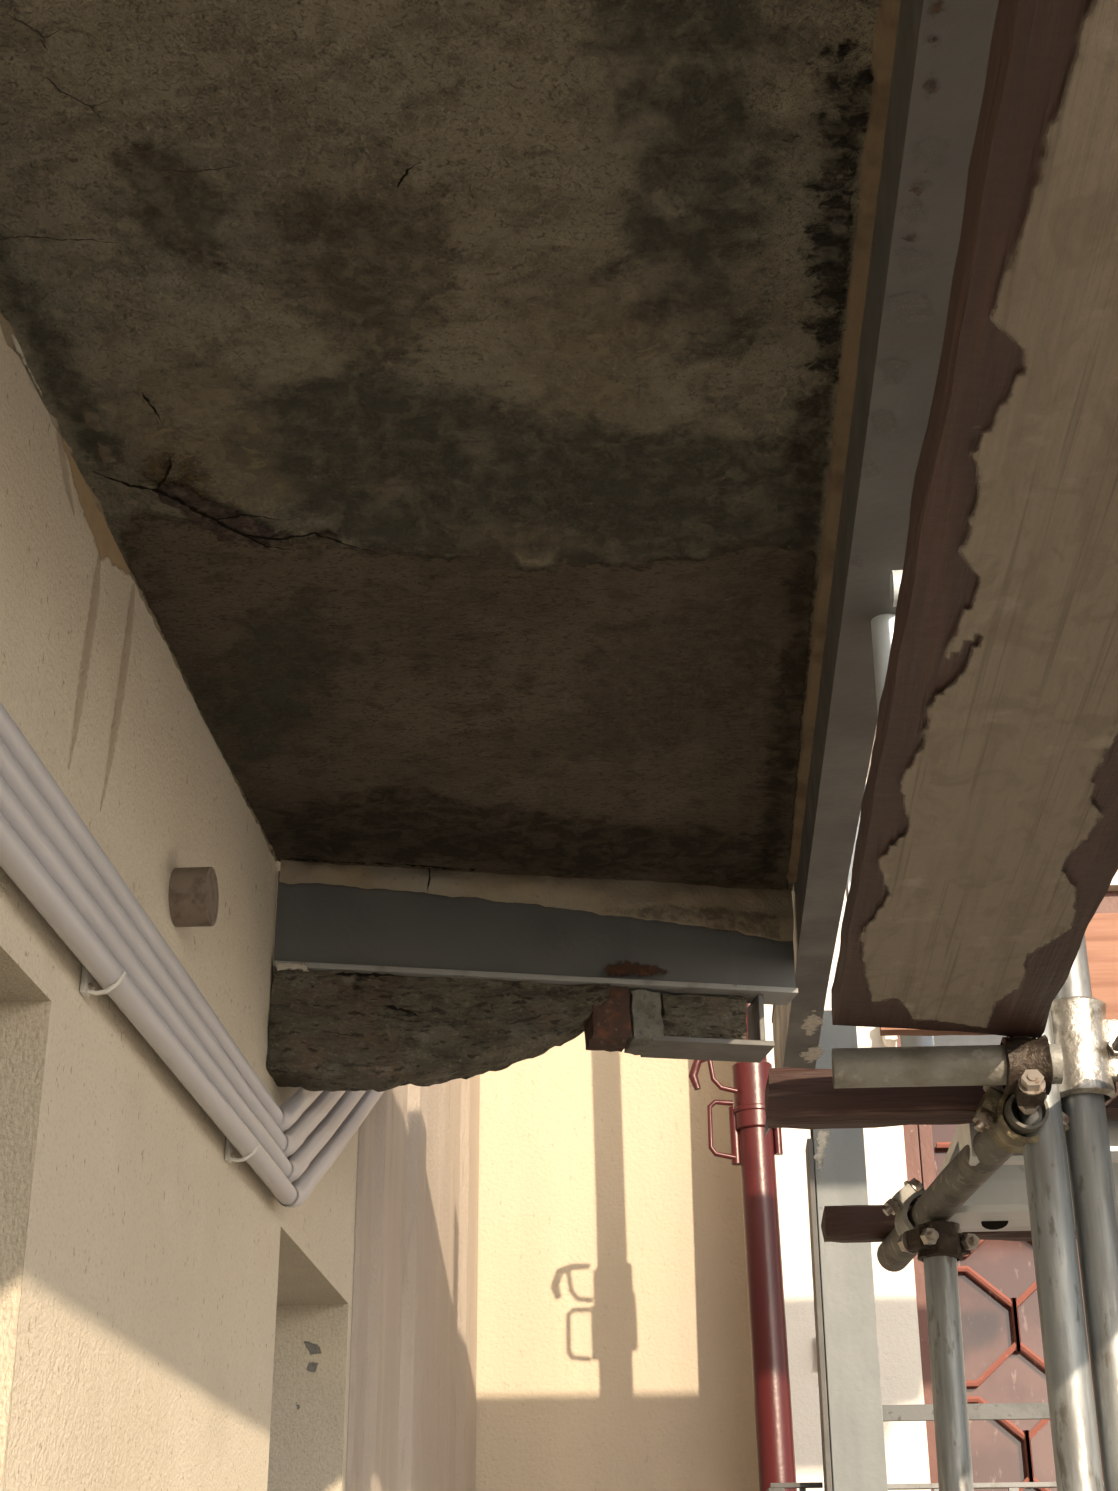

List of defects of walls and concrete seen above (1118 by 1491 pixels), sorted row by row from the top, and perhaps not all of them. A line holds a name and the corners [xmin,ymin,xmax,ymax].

crack [142,392,161,421]
crack [94,455,409,555]
water stain [0,0,874,615]
water stain [268,633,809,886]